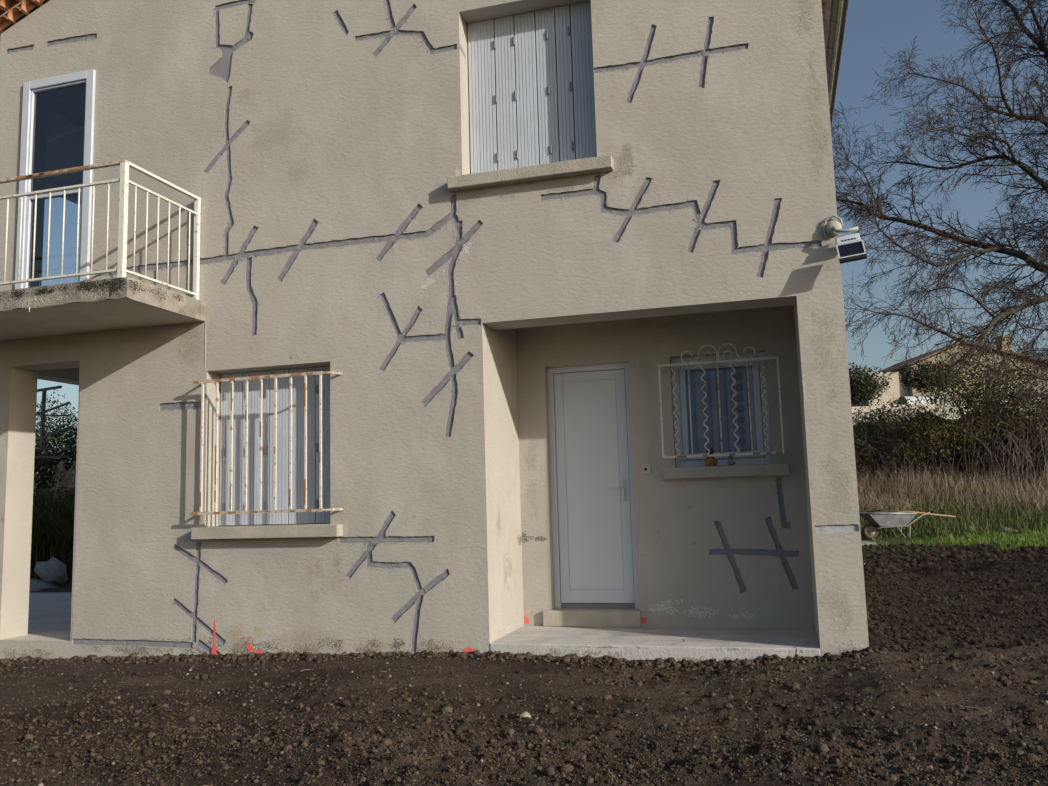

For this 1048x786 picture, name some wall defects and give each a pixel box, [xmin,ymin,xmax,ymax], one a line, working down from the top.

crack [213,0,256,54]
crack [330,0,457,57]
crack [594,16,749,103]
damp [0,278,184,308]
crack [94,86,483,437]
crack [540,175,822,277]
corrosion [214,445,236,514]
corrosion [289,479,312,512]
crack [709,477,860,594]
crack [72,542,228,655]
crack [338,511,450,653]